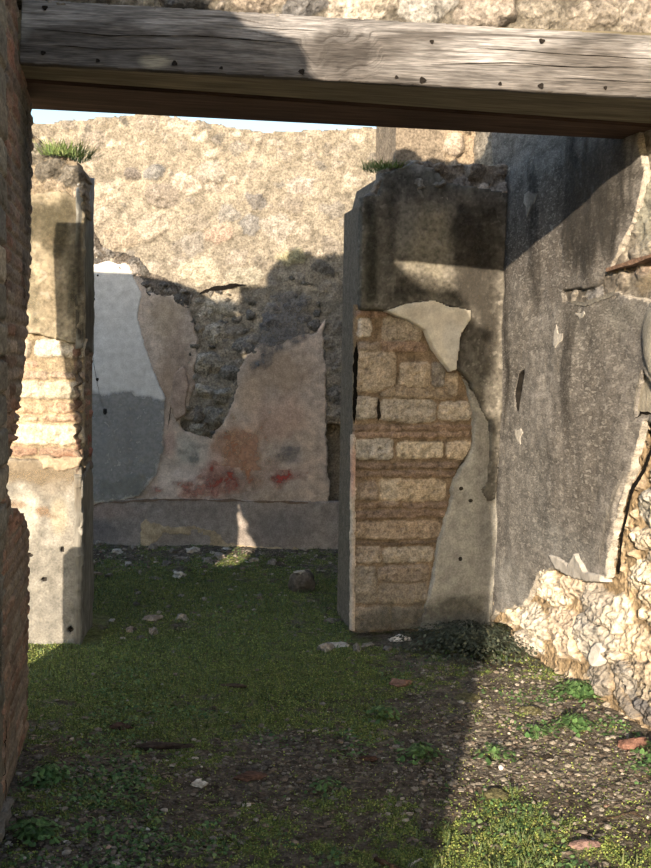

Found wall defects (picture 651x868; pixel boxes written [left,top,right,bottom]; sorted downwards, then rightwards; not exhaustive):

water stain [562,138,631,273]
spalling [7,333,99,472]
spalling [94,232,321,439]
spalling [140,519,298,550]
spalling [349,304,472,642]
water stain [395,207,506,352]
spalling [493,370,651,732]